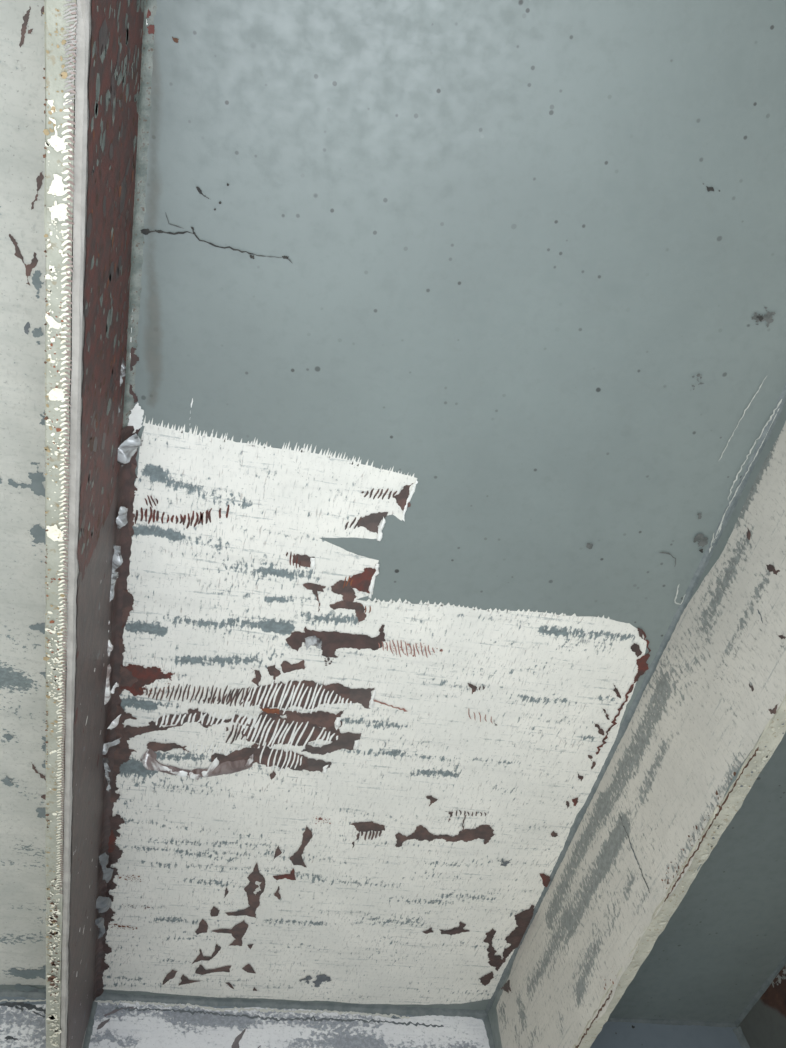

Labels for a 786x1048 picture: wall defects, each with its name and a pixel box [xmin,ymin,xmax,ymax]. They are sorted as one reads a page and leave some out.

crack [140,215,293,264]
peeling [0,0,67,1048]
rust [43,0,443,1048]
peeling [89,416,786,1048]
rust [661,747,759,902]
rust [575,966,614,1048]
rust [758,964,786,1023]